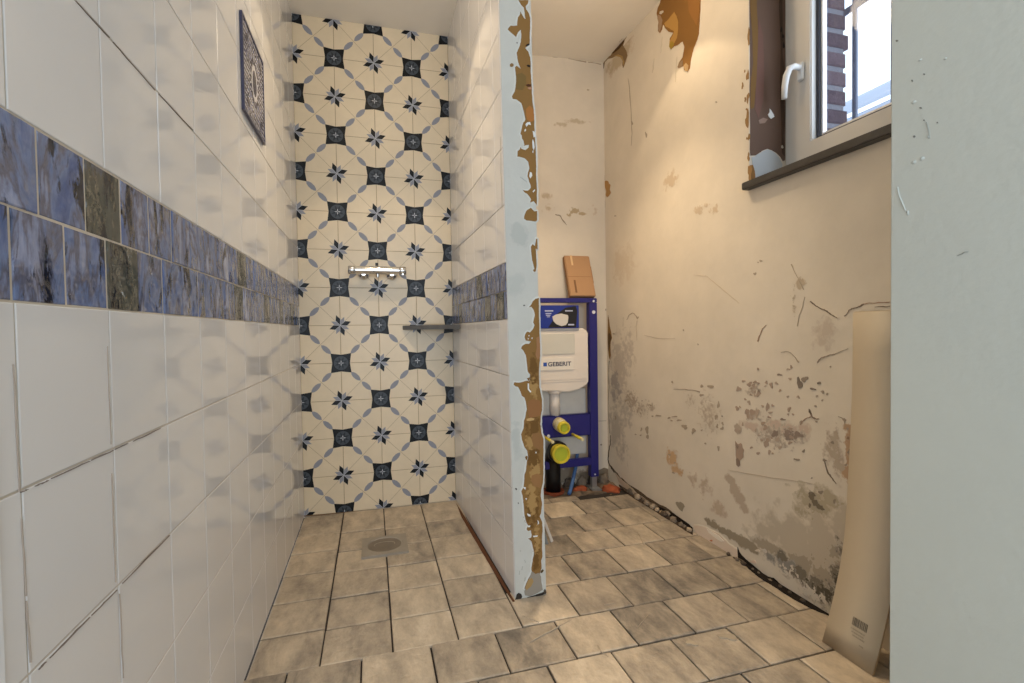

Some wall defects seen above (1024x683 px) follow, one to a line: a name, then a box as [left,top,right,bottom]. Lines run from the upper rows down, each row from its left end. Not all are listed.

flaking render [506,0,539,223]
flaking render [656,0,702,73]
flaking render [741,0,786,180]
flaking render [529,237,539,273]
flaking render [512,297,546,600]
water stain [600,313,849,613]